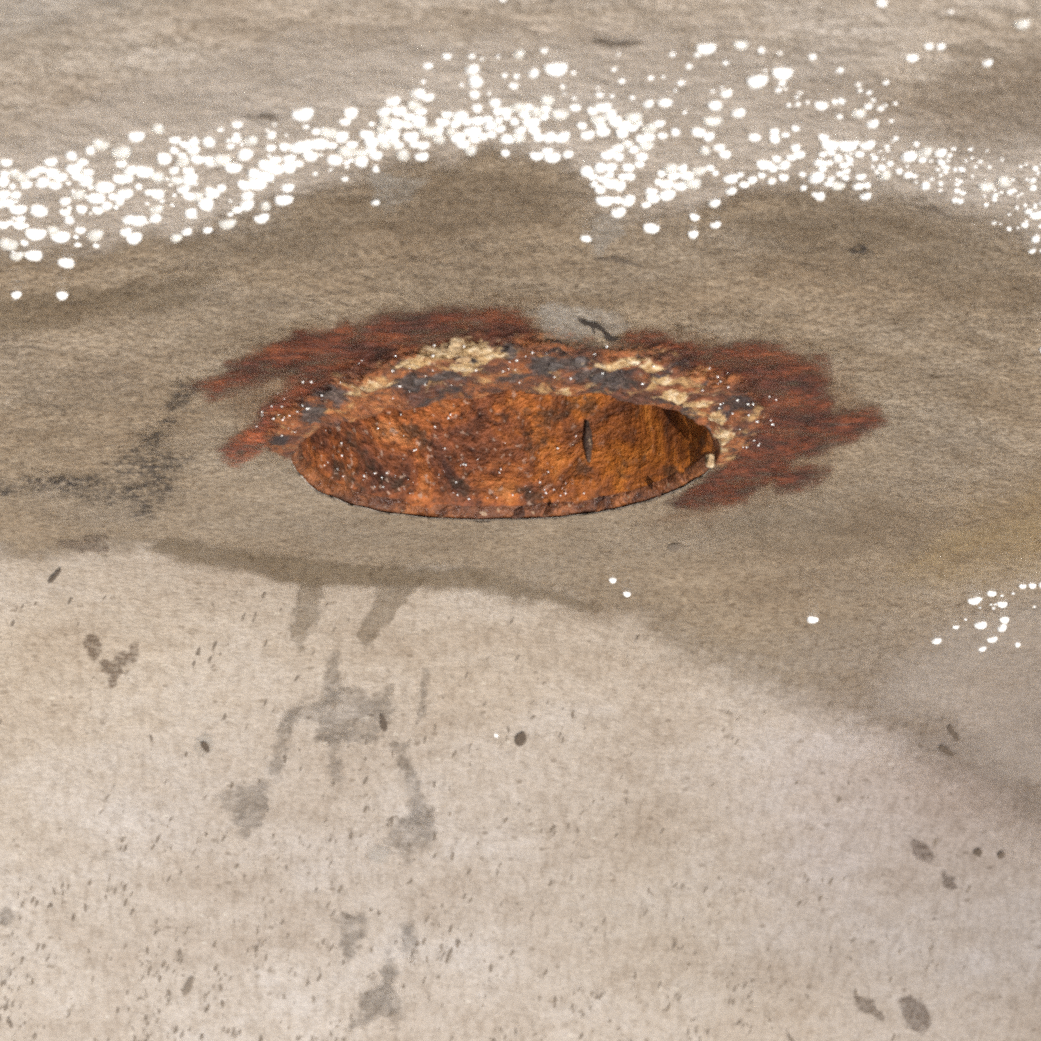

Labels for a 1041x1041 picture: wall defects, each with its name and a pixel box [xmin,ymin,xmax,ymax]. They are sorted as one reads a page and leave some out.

rust [194,310,537,459]
peeling [508,508,525,519]
water stain [0,35,1041,805]
peeling [583,420,593,462]
peeling [705,454,714,468]
rust [625,332,884,508]